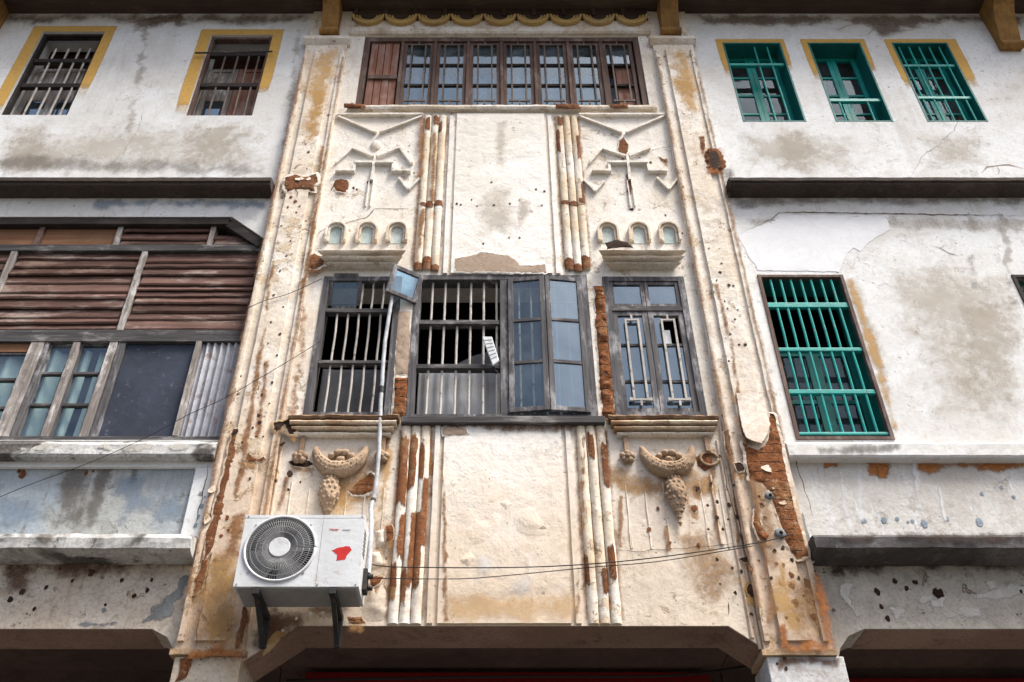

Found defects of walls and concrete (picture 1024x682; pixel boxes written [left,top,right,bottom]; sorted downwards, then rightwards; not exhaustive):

spalling [699,136,726,170]
spalling [281,168,371,222]
peeling [454,243,548,275]
peeling [738,215,890,272]
spalling [592,285,616,421]
damp [904,280,1010,371]
spalling [587,431,610,488]
damp [62,469,180,525]
spalling [141,414,300,623]
spalling [369,433,429,607]
spalling [683,393,822,640]
spalling [584,543,617,594]